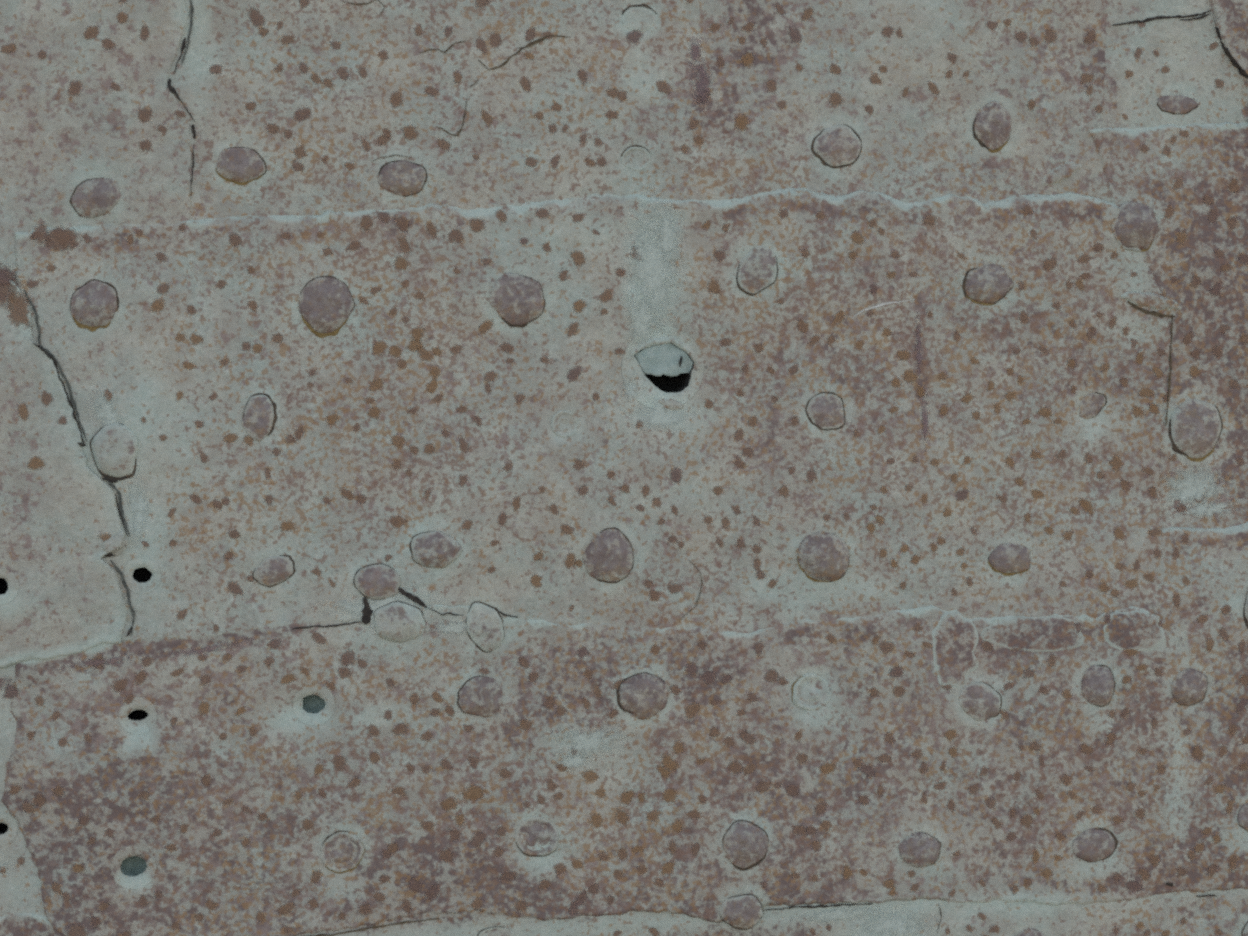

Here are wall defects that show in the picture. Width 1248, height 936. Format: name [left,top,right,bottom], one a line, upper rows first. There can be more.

crack [167,0,196,194]
corrosion [317,210,506,299]
crack [24,290,87,446]
corrosion [373,308,482,426]
corrosion [1052,243,1170,417]
crack [103,476,135,637]
corrosion [704,487,776,588]
corrosion [1086,529,1190,624]
corrosion [369,692,473,763]
corrosion [523,741,706,889]
crack [309,918,440,936]
crack [766,902,873,910]